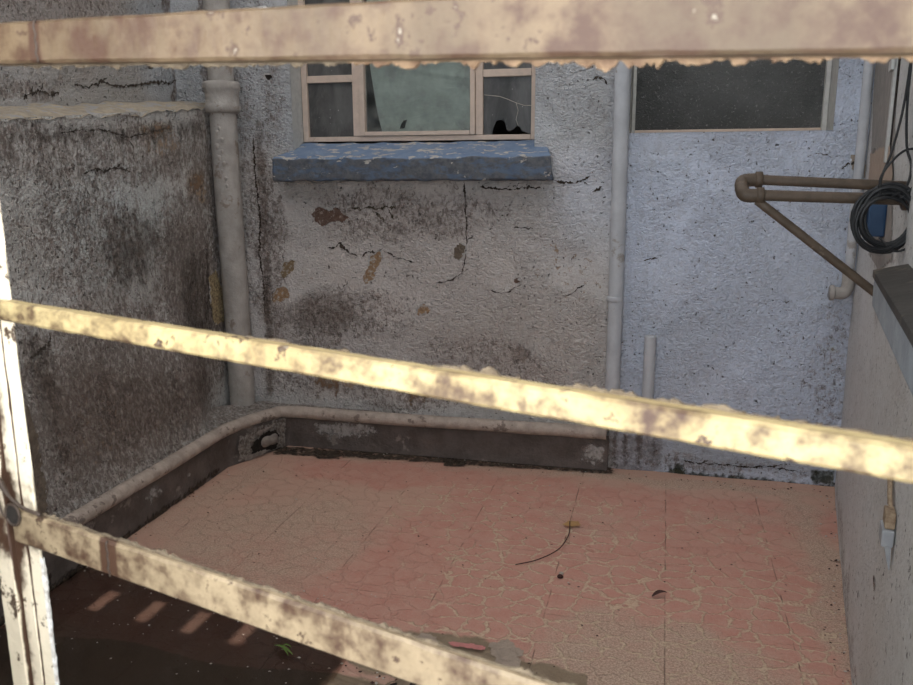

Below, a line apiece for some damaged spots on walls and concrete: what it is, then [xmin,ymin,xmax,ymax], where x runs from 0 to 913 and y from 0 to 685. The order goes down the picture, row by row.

crack [24,66,176,100]
peeling [311,205,349,226]
crack [352,206,396,223]
crack [437,176,602,284]
peeling [272,258,297,303]
crack [329,242,414,263]
peeling [363,250,384,284]
peeling [23,398,49,515]